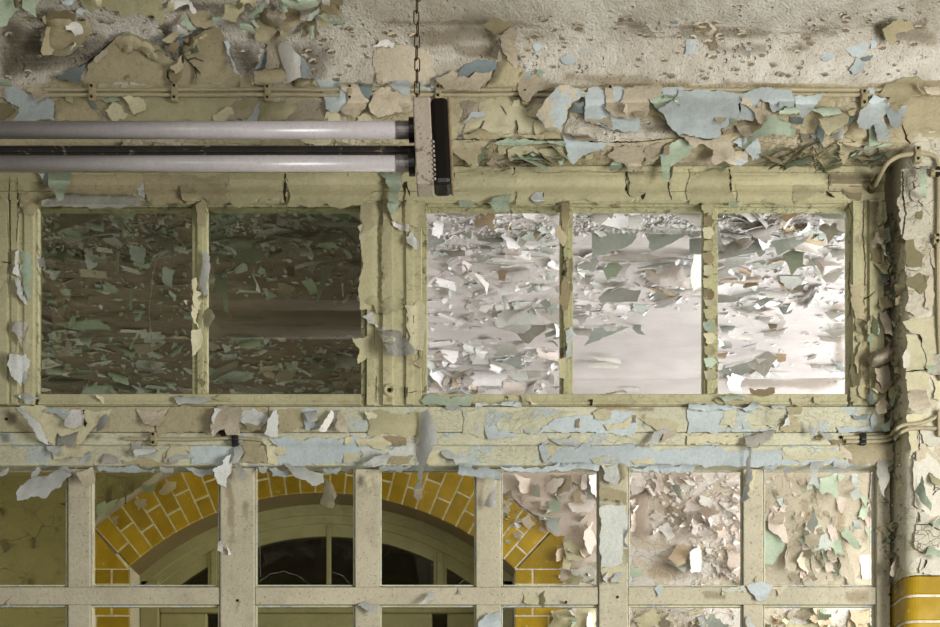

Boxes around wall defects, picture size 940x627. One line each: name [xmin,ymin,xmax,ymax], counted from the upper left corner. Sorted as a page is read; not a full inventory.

crack [281,172,289,202]
peeling [0,0,940,436]
crack [902,125,936,237]
peeling [0,309,904,601]
peeling [908,422,940,575]
peeling [0,595,66,627]